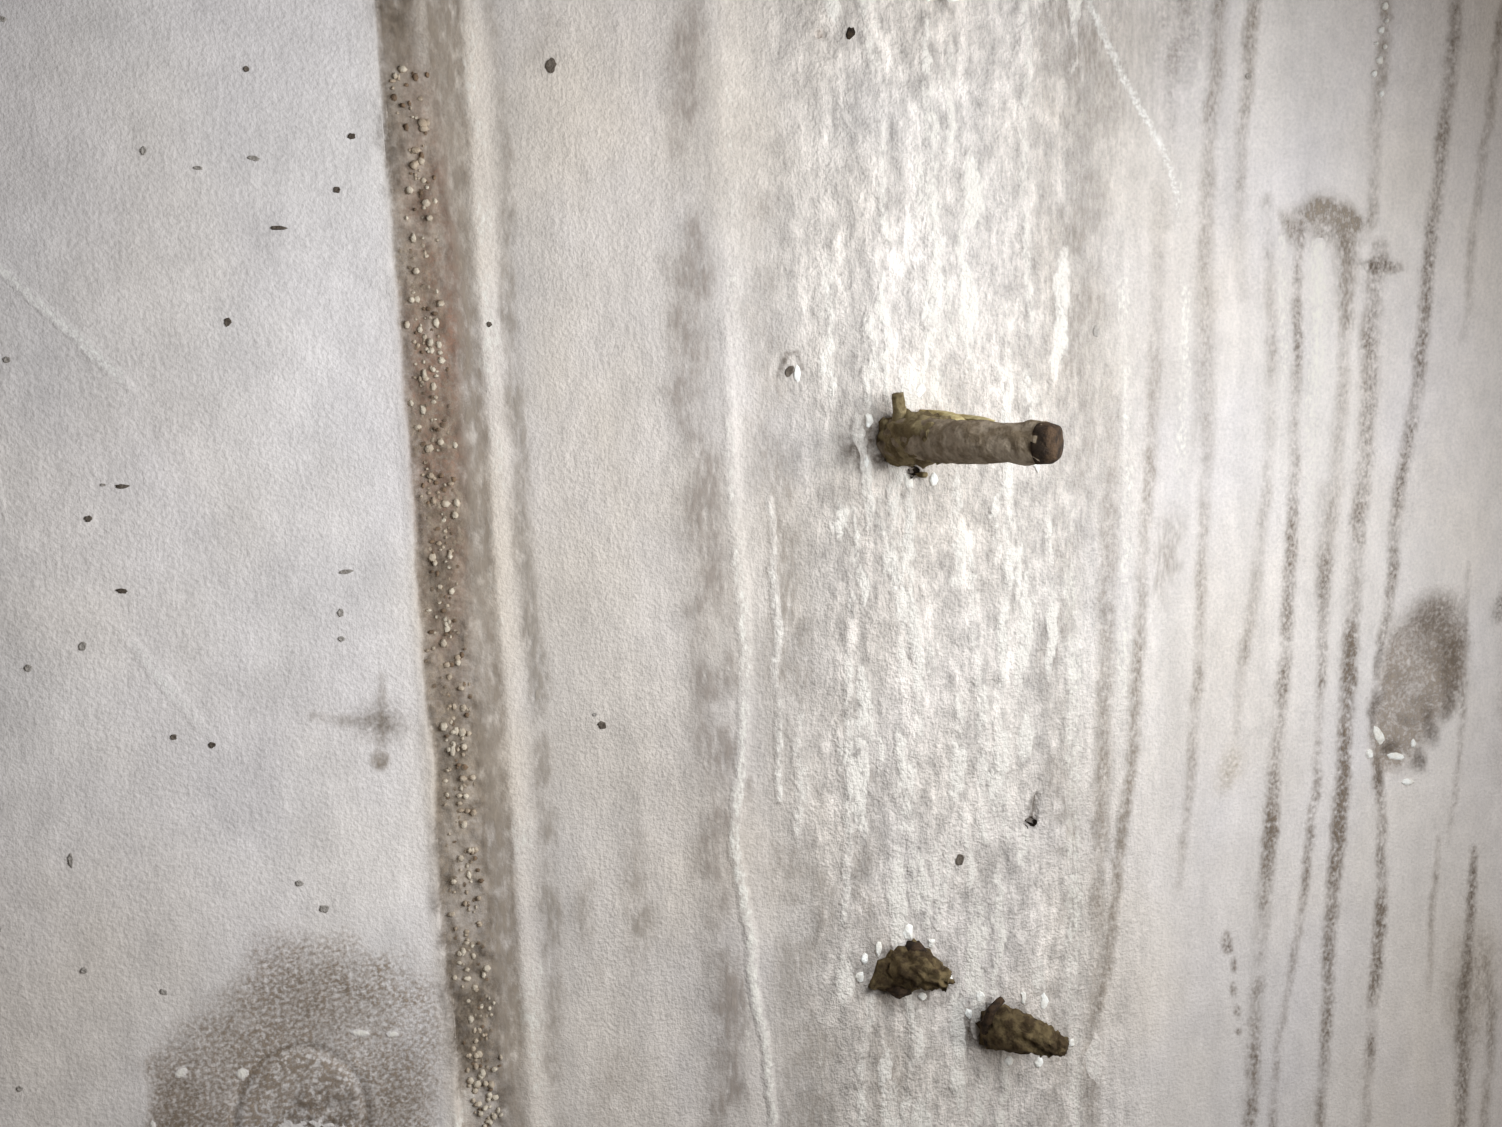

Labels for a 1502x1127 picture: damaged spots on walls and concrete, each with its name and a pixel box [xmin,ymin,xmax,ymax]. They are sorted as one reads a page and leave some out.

leakage [1417,220,1436,377]
leakage [149,946,488,1127]
corrosion [868,938,955,999]